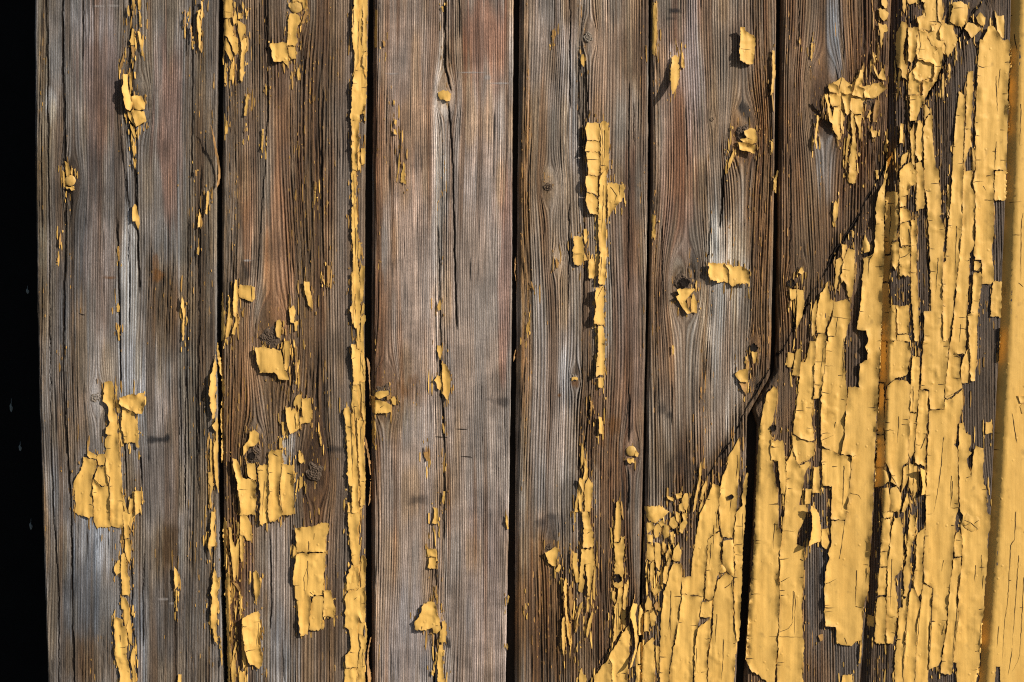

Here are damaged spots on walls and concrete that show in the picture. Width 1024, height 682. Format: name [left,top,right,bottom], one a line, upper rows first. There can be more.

peeling [72,376,146,682]
peeling [119,0,149,174]
peeling [203,0,400,682]
peeling [389,101,408,194]
peeling [410,586,451,682]
crack [438,0,460,533]
peeling [544,0,1024,682]
crack [589,0,983,682]